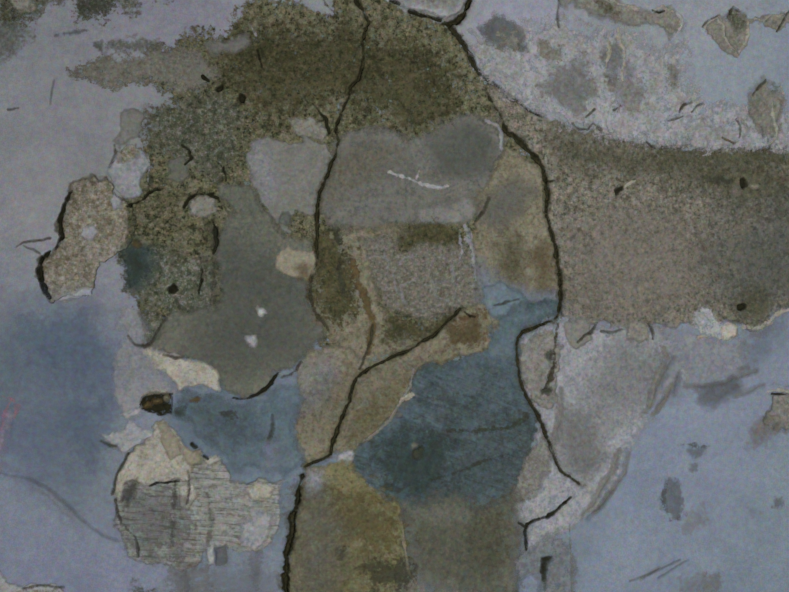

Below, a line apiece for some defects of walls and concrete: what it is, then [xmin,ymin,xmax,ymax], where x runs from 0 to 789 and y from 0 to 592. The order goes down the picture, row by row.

flaking render [0,572,64,592]
peeling [0,0,142,27]
flaking render [101,420,282,571]
crack [309,0,370,330]
crack [281,308,474,592]
flaking render [36,0,789,418]
crack [442,0,579,551]
flaking render [337,88,789,592]